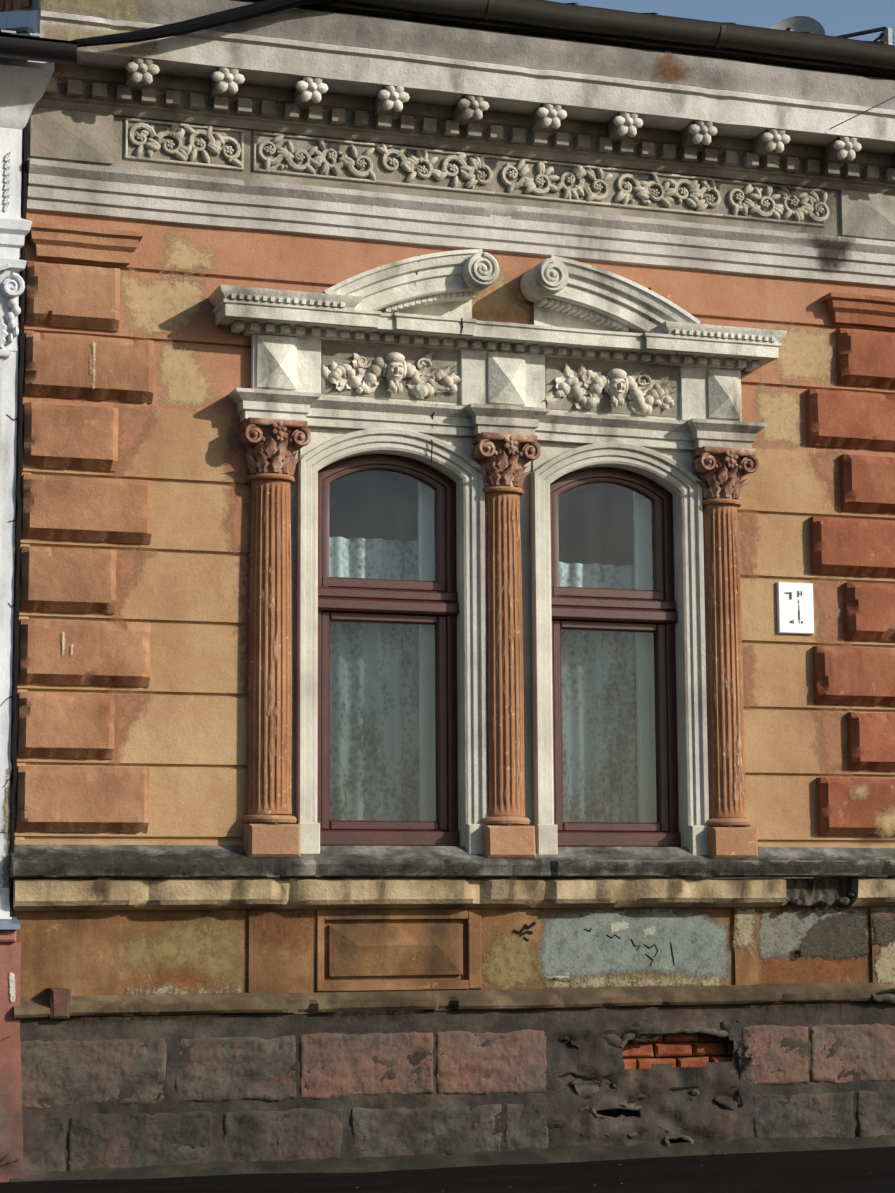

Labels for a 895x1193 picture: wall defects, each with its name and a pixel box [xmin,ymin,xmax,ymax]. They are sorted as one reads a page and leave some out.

flaking render [483,908,732,990]
flaking render [757,906,895,984]
spalling [546,1019,770,1140]
spalling [659,1127,694,1147]